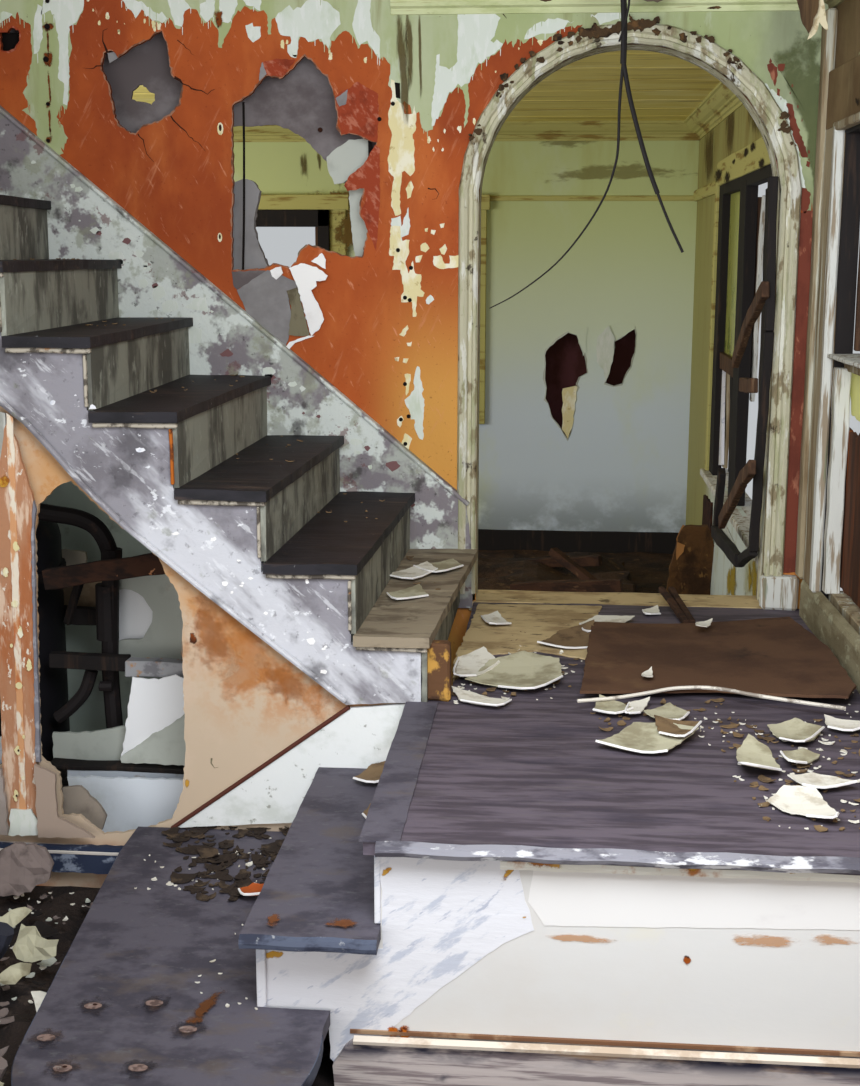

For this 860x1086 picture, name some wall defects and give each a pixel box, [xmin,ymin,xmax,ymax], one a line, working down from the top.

peeling [0,0,822,449]
rust [734,936,790,947]
rust [816,936,848,944]